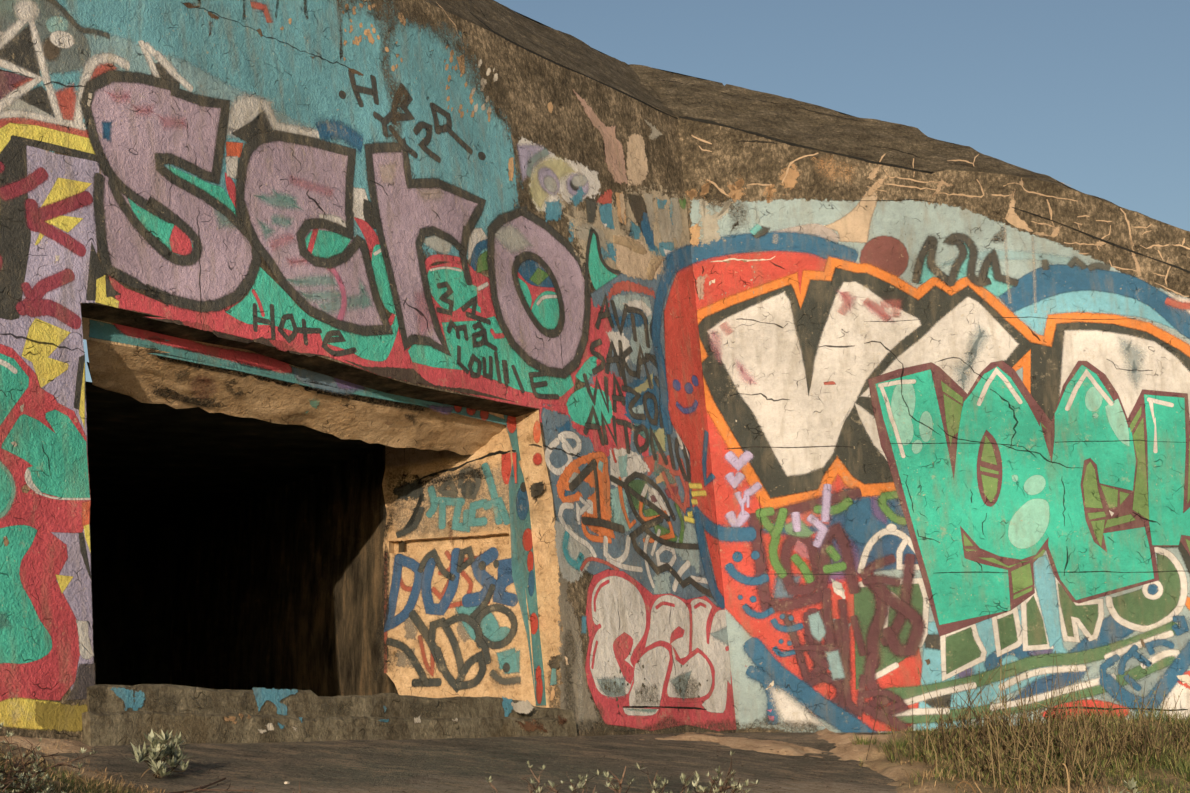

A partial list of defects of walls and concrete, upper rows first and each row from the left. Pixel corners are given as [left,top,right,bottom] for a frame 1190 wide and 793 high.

crack [436,1,1190,297]
peeling [573,90,784,294]
peeling [763,163,803,203]
peeling [696,275,727,300]
spalling [145,317,321,357]
spalling [343,359,518,403]
crack [820,317,1190,589]